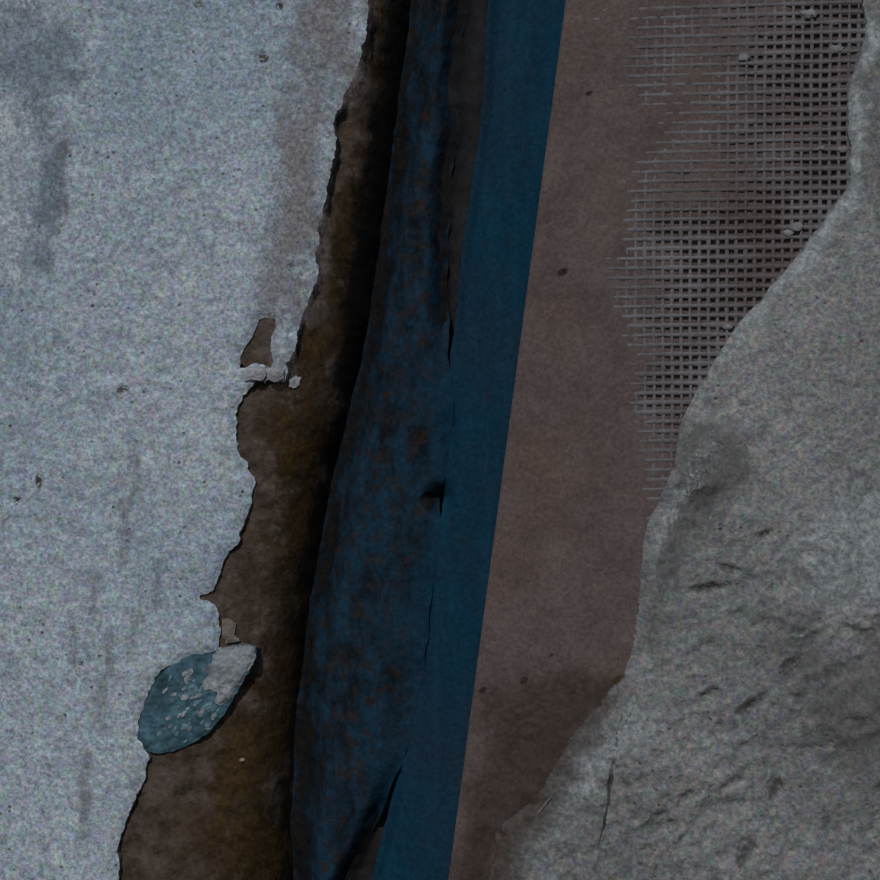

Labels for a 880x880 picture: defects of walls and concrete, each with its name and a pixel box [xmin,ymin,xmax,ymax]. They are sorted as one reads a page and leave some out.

spalling [119,1,393,880]
crack [597,698,637,849]
peeling [448,0,880,880]